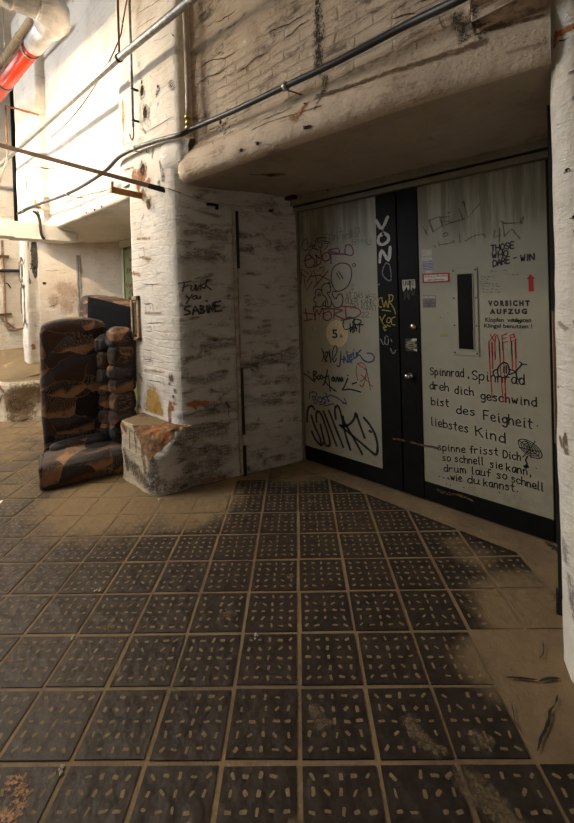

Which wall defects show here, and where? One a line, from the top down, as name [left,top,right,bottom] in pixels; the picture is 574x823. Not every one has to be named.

crack [201,0,324,86]
damp [313,0,328,110]
mould [449,0,487,44]
rust [124,163,151,209]
damp [0,382,41,422]
spalling [132,424,188,462]